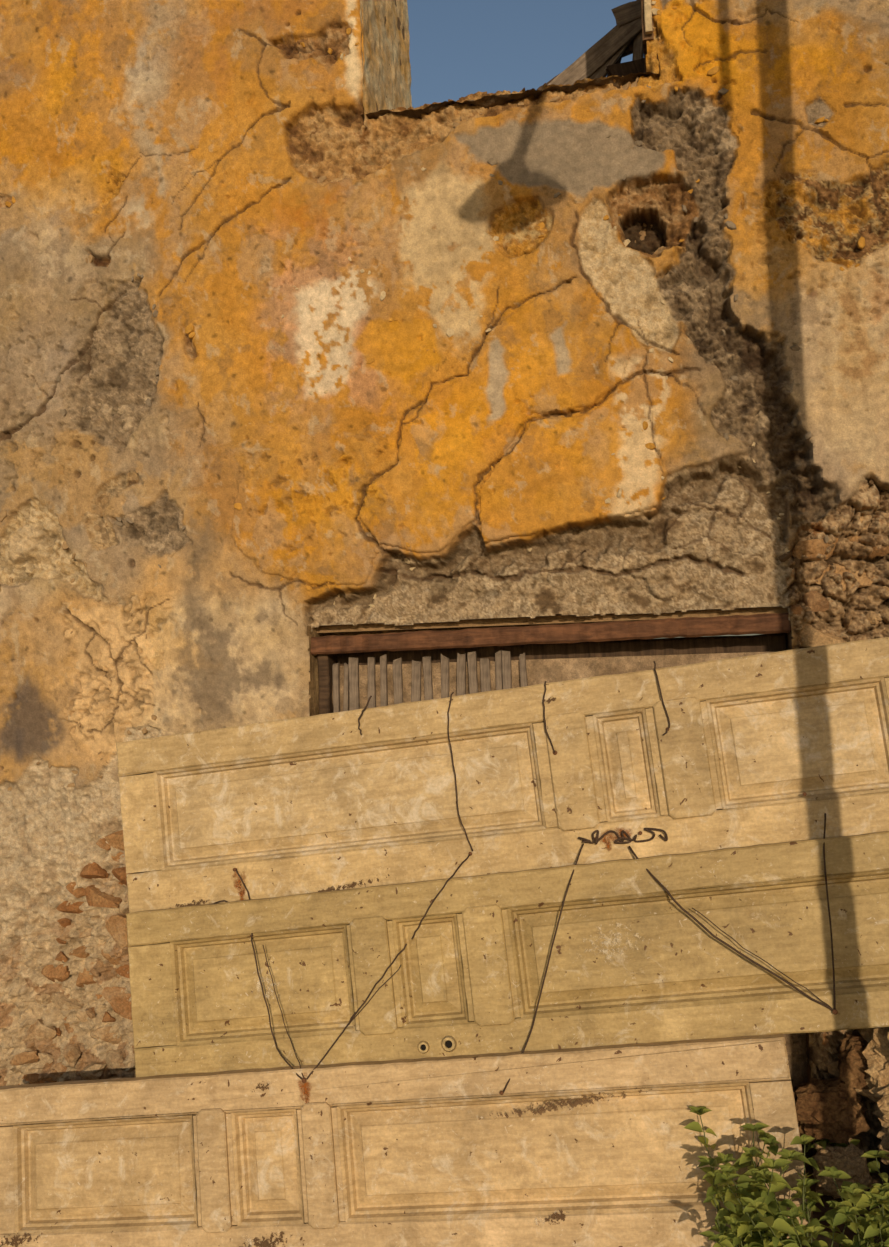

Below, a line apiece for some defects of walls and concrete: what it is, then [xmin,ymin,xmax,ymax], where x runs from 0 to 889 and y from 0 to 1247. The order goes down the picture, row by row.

crack [0,28,327,448]
crack [355,210,776,584]
spalling [267,0,889,649]
crack [751,102,889,216]
spalling [0,467,193,1086]
peeling [307,874,396,893]
spalling [807,1029,862,1080]
spalling [818,1088,882,1161]